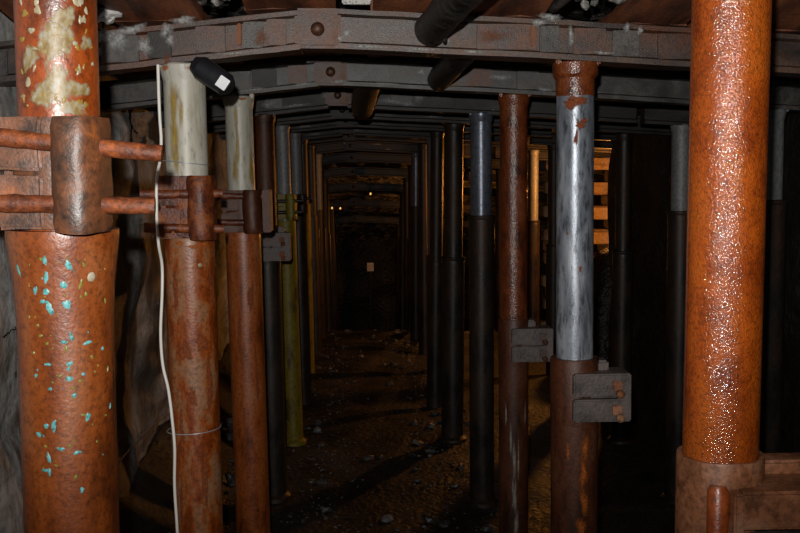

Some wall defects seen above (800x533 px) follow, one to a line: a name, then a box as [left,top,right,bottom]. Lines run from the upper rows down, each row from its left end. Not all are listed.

peeling [19,0,94,116]
corrosion [577,439,588,533]